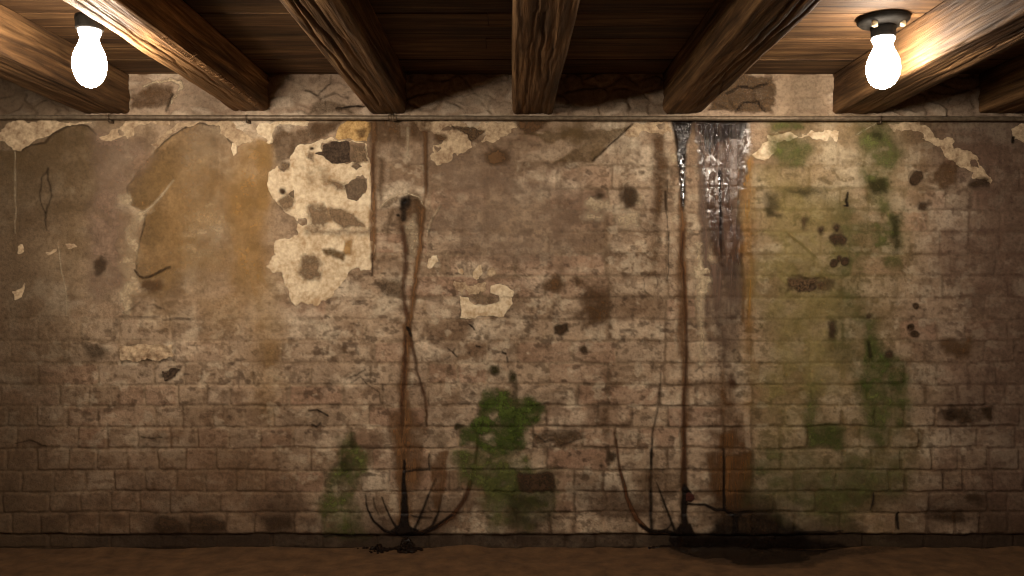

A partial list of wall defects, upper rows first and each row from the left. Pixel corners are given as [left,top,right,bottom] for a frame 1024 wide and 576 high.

flaking render [0,120,92,151]
flaking render [99,78,376,313]
flaking render [411,120,518,165]
flaking render [453,265,514,319]
leakage [653,121,750,488]
leakage [818,224,849,267]
flaking render [888,121,992,188]
rust [391,207,428,525]
crack [324,435,478,537]
leakage [513,471,555,513]
crack [614,381,753,546]
leakage [662,421,892,567]